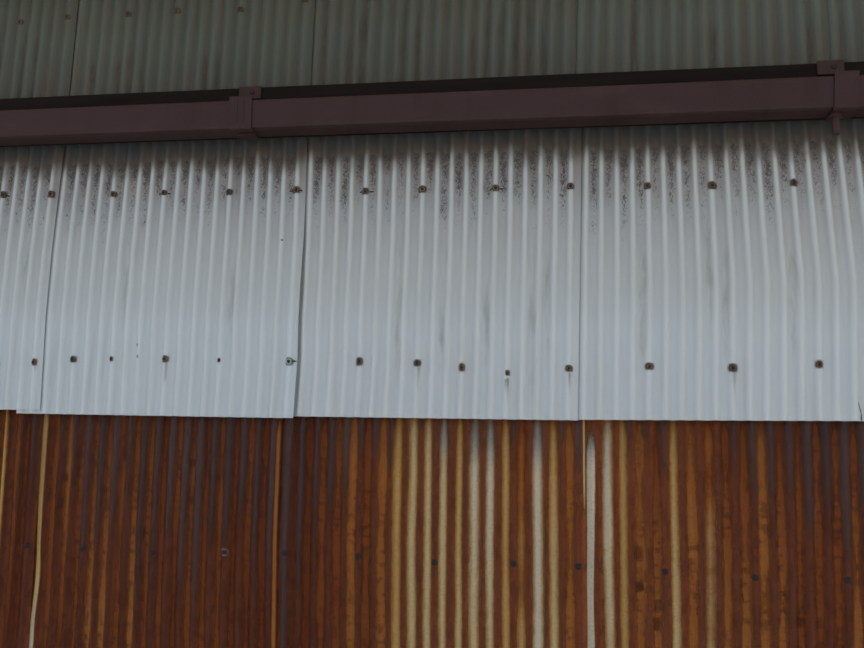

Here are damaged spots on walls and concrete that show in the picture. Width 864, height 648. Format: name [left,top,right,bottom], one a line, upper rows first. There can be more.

leakage [0,164,51,219]
leakage [67,156,294,221]
leakage [313,148,567,214]
leakage [590,140,864,209]
corrosion [0,410,31,648]
corrosion [43,414,281,648]
corrosion [289,416,585,648]
corrosion [602,420,864,648]